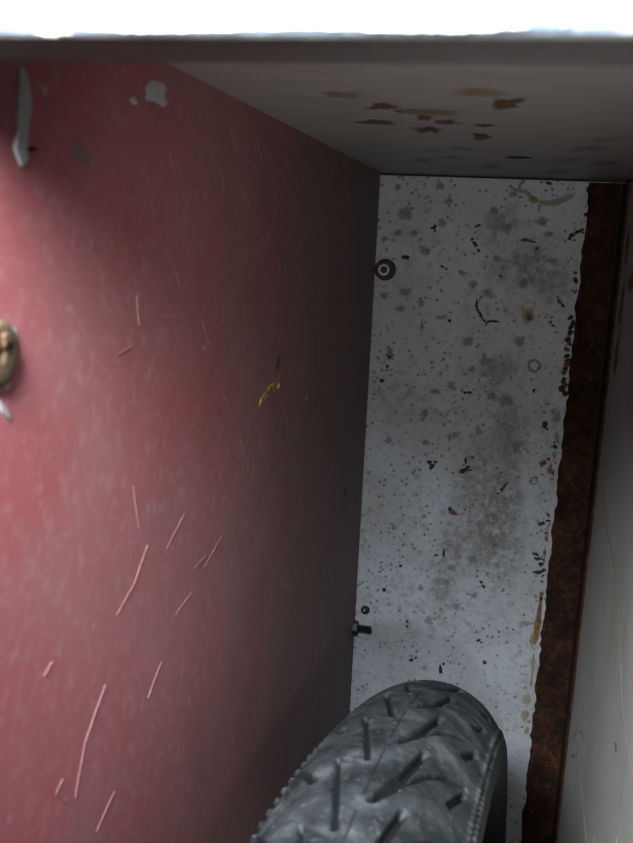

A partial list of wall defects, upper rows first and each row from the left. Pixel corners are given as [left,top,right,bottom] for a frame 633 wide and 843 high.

peeling [129,80,167,107]
corrosion [461,89,523,109]
corrosion [371,103,459,133]